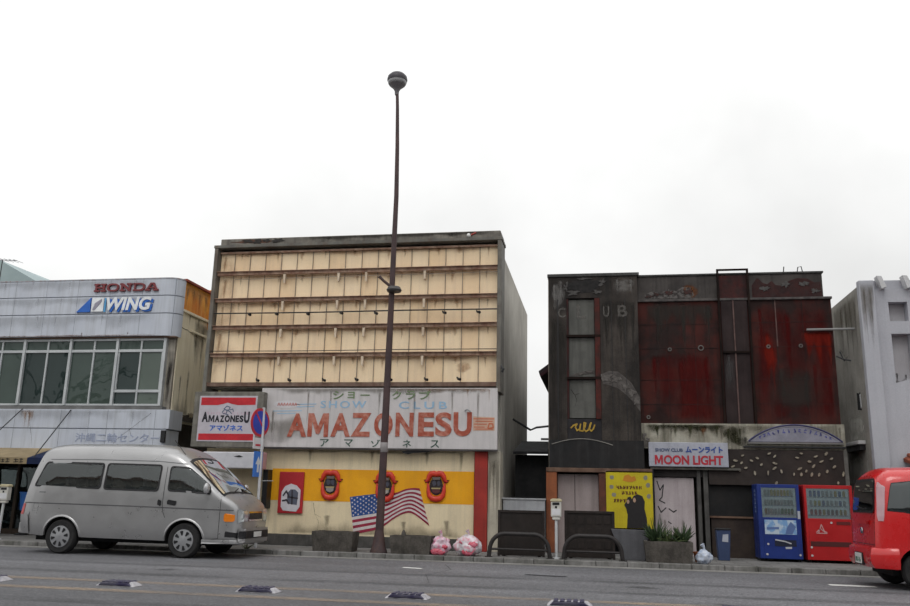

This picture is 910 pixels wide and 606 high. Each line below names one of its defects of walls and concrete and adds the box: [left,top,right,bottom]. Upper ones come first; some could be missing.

peeling [645,287,695,299]
peeling [752,278,822,298]